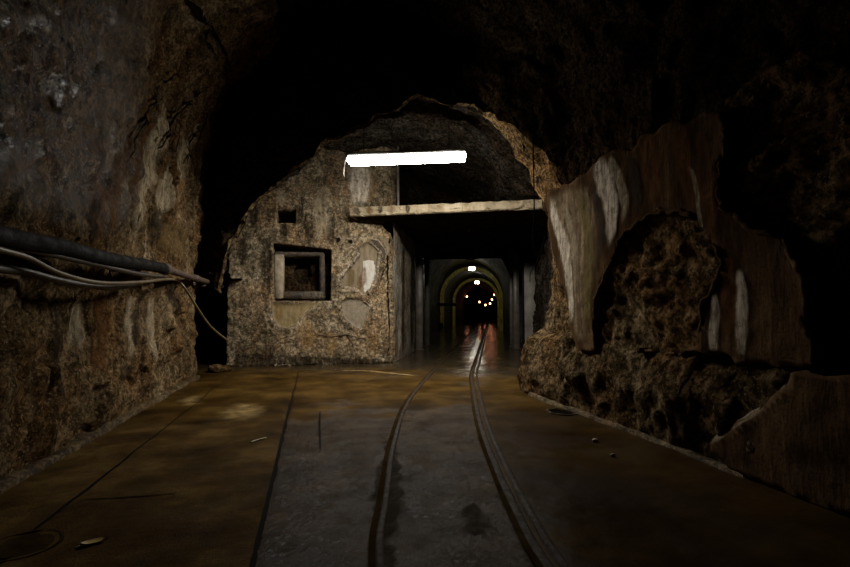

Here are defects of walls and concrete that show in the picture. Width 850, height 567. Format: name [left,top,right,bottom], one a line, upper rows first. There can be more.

peeling [335,235,390,330]
spalling [591,207,725,360]